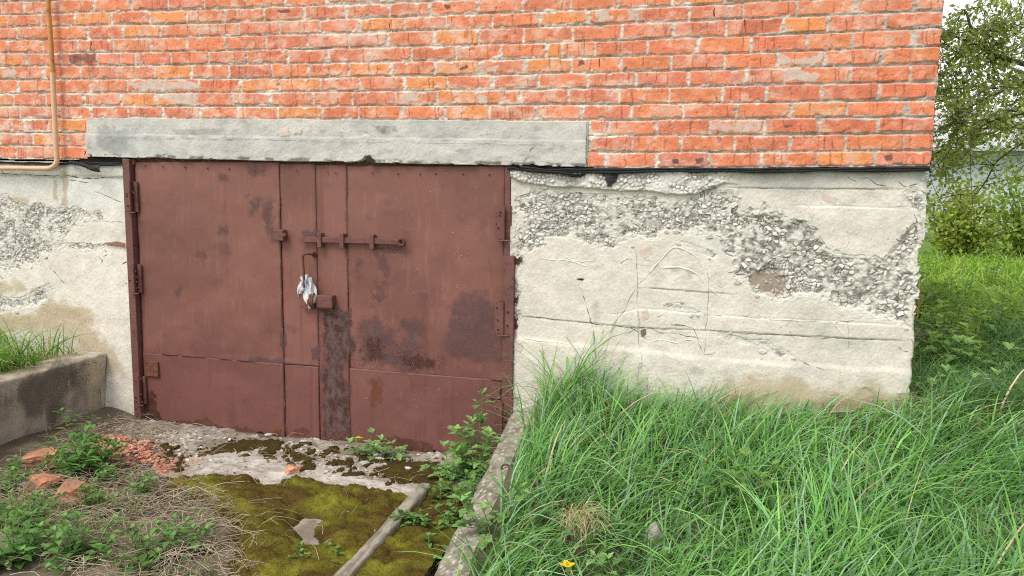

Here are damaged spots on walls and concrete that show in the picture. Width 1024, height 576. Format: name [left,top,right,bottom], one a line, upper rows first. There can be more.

spalling [0,194,106,314]
corrosion [320,308,385,441]
crack [523,251,873,378]
spalling [510,178,930,413]